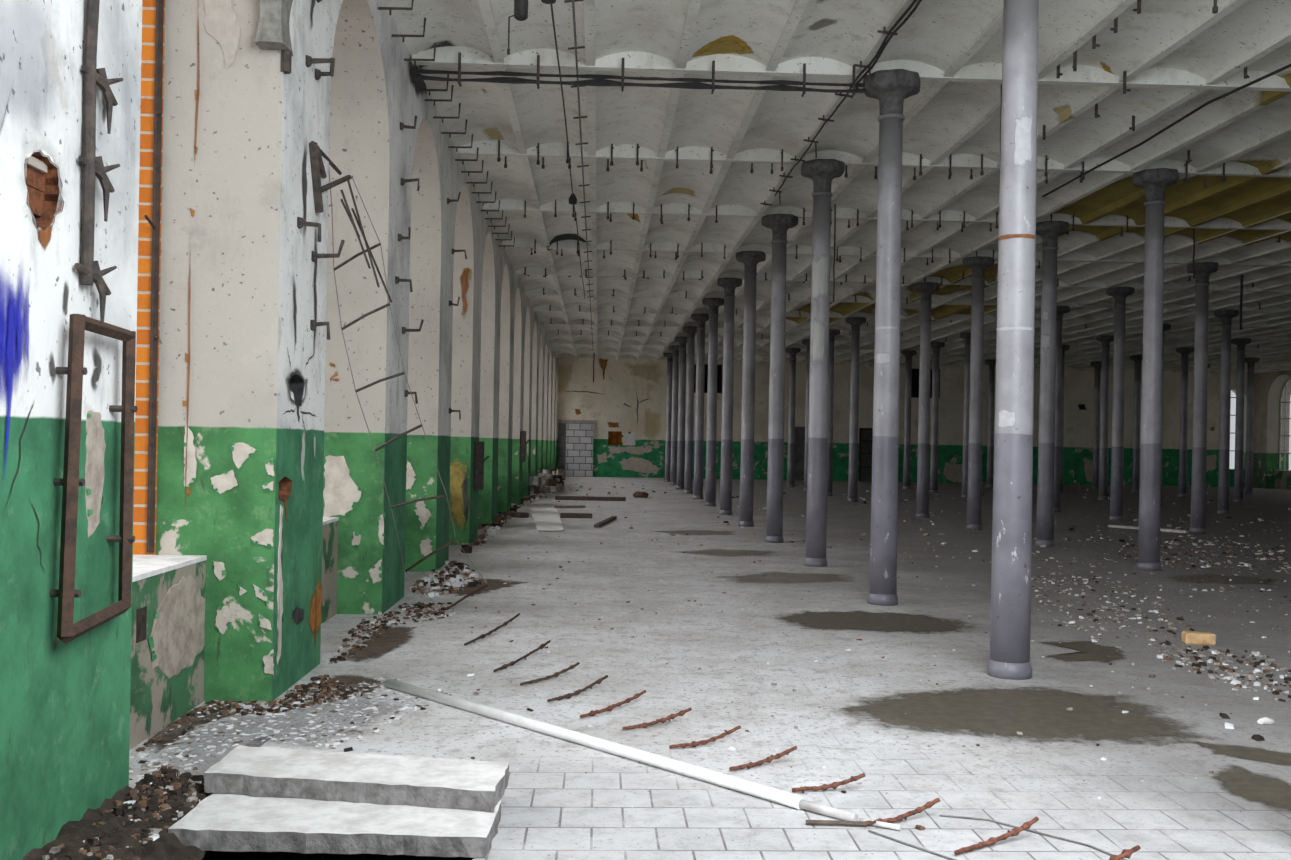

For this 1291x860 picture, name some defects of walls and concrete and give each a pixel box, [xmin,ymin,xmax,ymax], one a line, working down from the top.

hole [286,369,307,421]
peeling [597,432,661,474]
peeling [323,455,362,517]
leakage [450,463,469,525]
peeling [183,425,293,675]
peeling [351,532,361,549]
peeling [369,513,385,584]
peeling [136,575,232,679]
rust [292,581,322,645]
leakage [779,611,972,634]
leakage [840,687,1291,810]
hole [223,851,474,860]